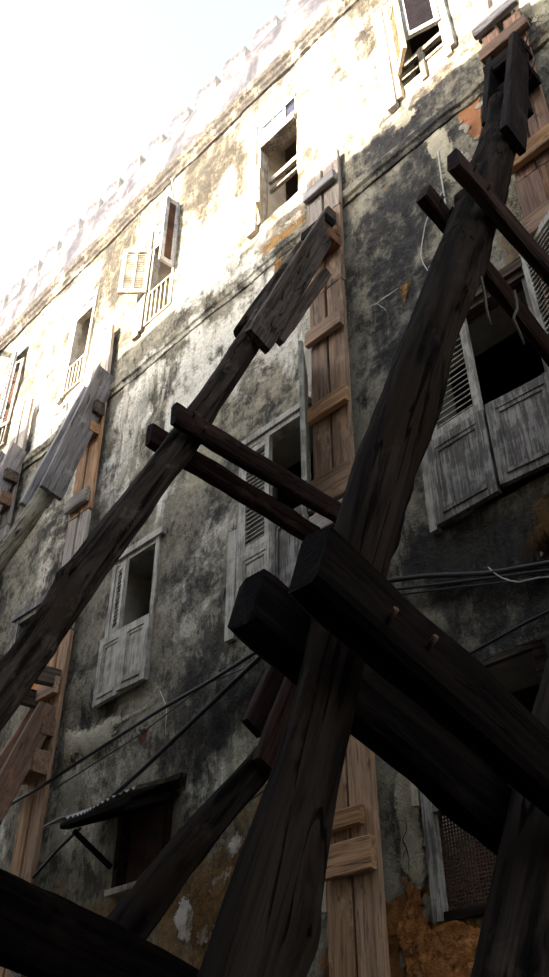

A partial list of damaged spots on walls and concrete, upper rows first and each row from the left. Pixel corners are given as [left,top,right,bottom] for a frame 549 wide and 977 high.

damp [348,0,379,56]
damp [179,131,244,238]
peeling [425,96,483,186]
damp [291,307,312,396]
damp [183,659,265,787]
spalling [393,772,481,977]